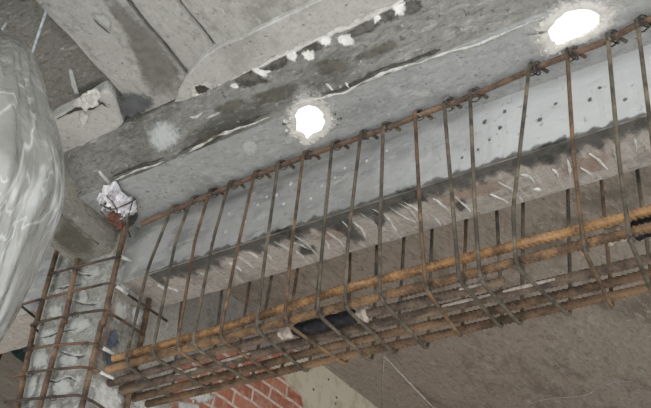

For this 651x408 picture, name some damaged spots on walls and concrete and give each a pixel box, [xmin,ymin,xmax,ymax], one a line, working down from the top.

spalling [230,0,423,88]
spalling [529,0,622,58]
spalling [282,93,342,148]
spalling [97,170,140,238]
spalling [373,202,419,232]
water stain [148,113,648,285]
spalling [230,252,272,272]
spalling [275,236,318,258]
flaking render [110,265,144,326]
flaking render [177,289,289,359]
flaking render [272,357,377,408]